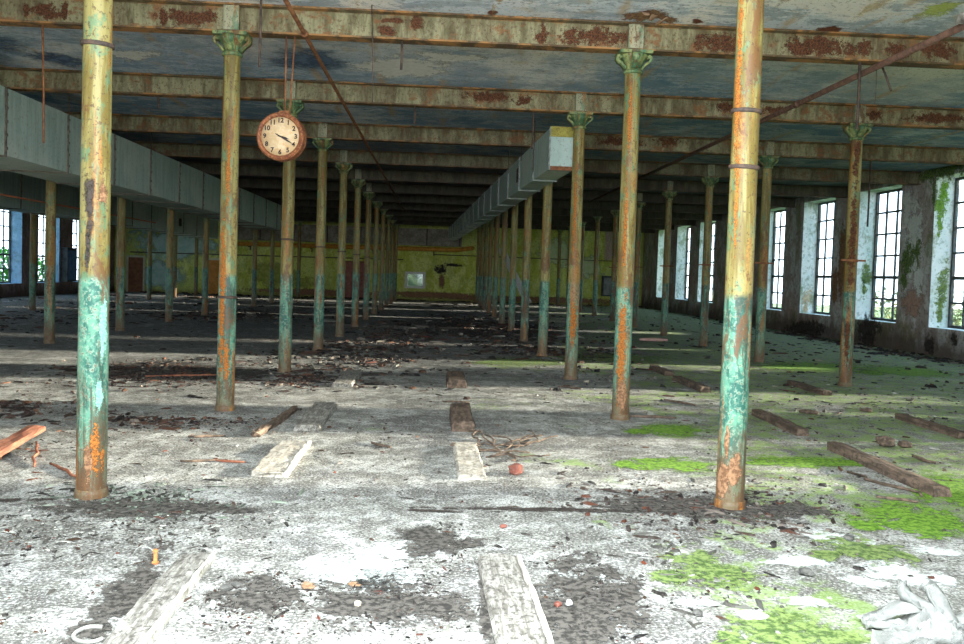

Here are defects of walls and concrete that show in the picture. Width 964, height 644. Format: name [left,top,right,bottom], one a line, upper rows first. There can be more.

rust [151,7,218,27]
peeling [622,9,679,26]
rust [533,22,628,47]
rust [781,26,873,58]
leakage [25,52,82,68]
leakage [275,50,347,69]
leakage [931,178,943,237]
rust [218,123,231,391]
peeling [901,187,927,317]
leakage [935,298,944,327]
peeling [99,299,108,364]
peeling [95,381,104,416]